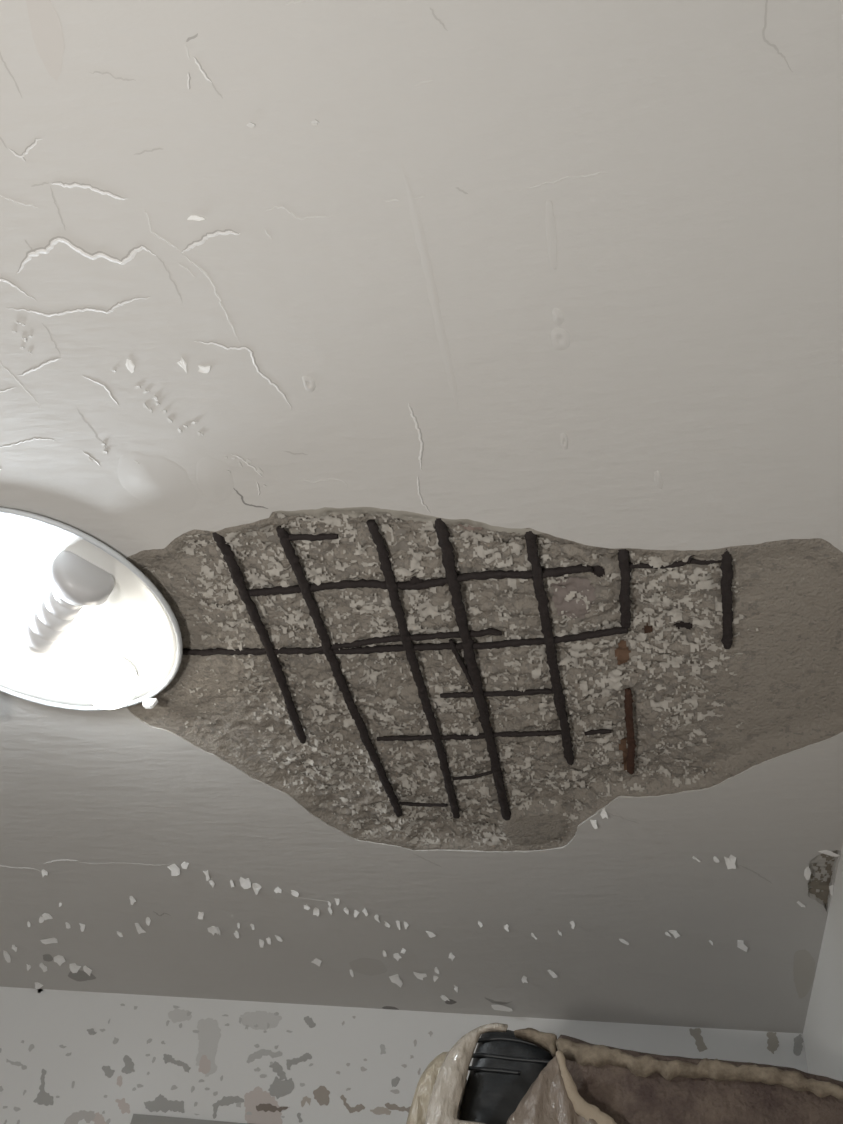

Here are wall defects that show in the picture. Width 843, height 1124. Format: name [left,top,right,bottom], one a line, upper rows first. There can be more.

crack [186,33,223,99]
crack [0,137,292,411]
crack [0,437,55,448]
crack [77,409,108,466]
spalling [126,507,843,852]
corrosion [615,640,631,665]
peeling [167,862,189,876]
peeling [230,877,409,930]
spalling [797,850,840,907]
peeling [27,938,96,993]
peeling [244,1086,283,1124]
peeling [301,1086,411,1115]